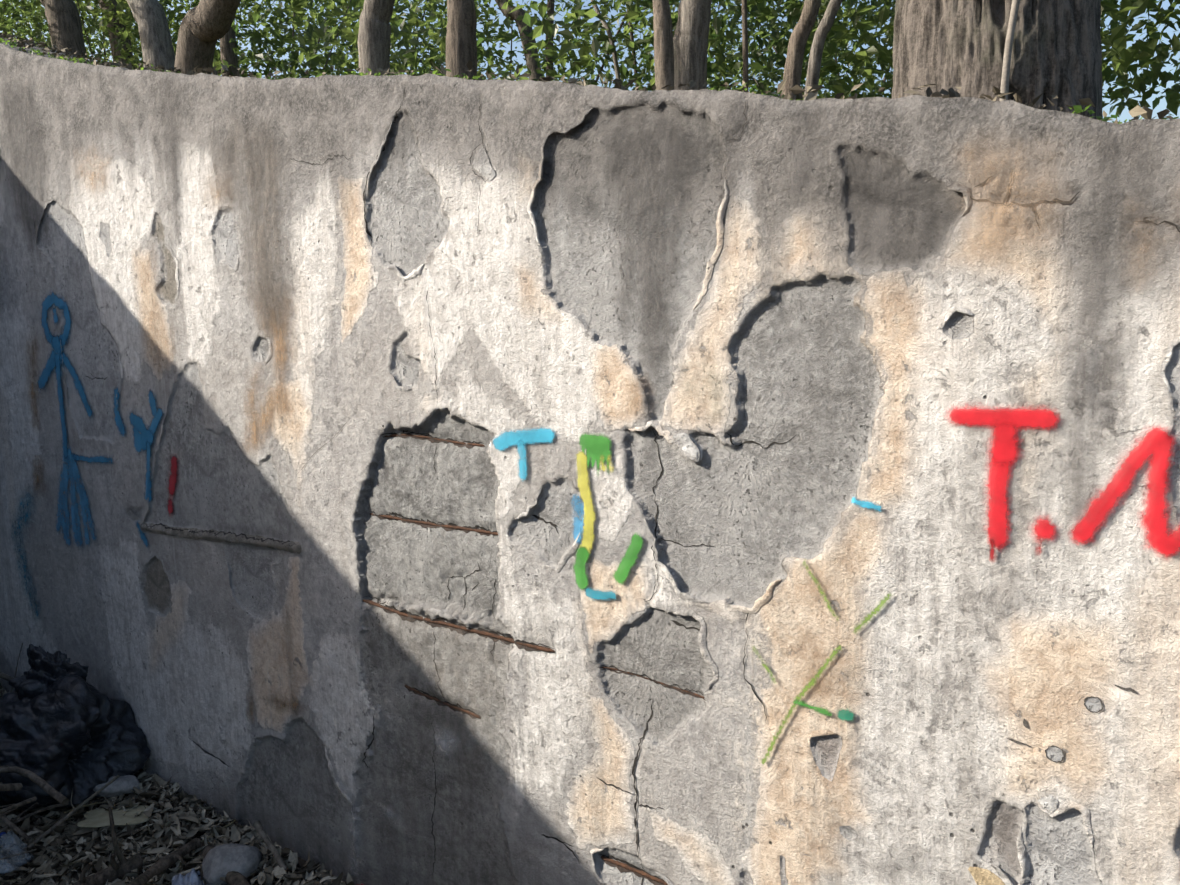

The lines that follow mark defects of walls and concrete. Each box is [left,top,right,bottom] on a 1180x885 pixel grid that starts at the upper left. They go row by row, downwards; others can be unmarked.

flaking render [366,110,450,281]
damp [617,130,681,365]
damp [856,171,930,247]
crack [1135,220,1180,232]
crack [646,427,714,602]
flaking render [527,101,974,747]
crack [728,434,796,449]
flaking render [1160,336,1180,525]
spalling [237,408,584,885]
crack [671,620,700,631]
crack [598,701,663,885]
flaking render [968,795,1102,885]